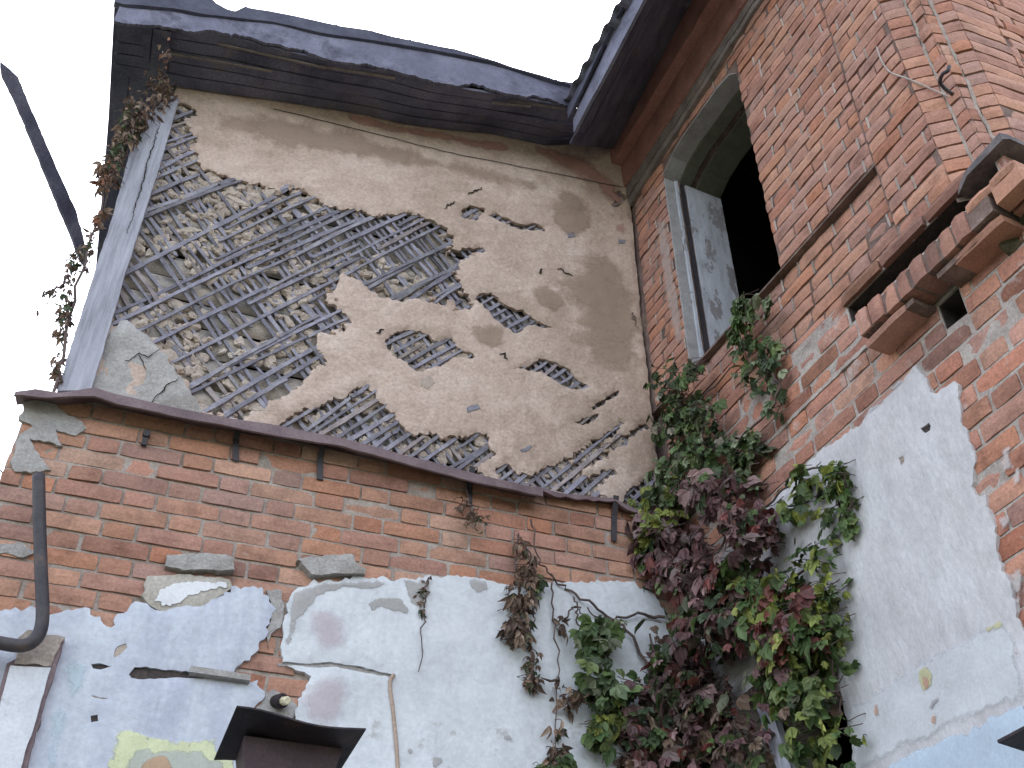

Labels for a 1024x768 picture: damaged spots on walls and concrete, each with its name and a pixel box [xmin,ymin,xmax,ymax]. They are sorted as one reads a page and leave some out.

leakage [554,191,589,233]
leakage [475,326,502,346]
leakage [535,259,639,369]
flaking render [743,365,1024,768]
flaking render [0,650,17,685]
flaking render [0,606,36,639]
flaking render [28,574,677,768]
flaking render [696,629,763,735]